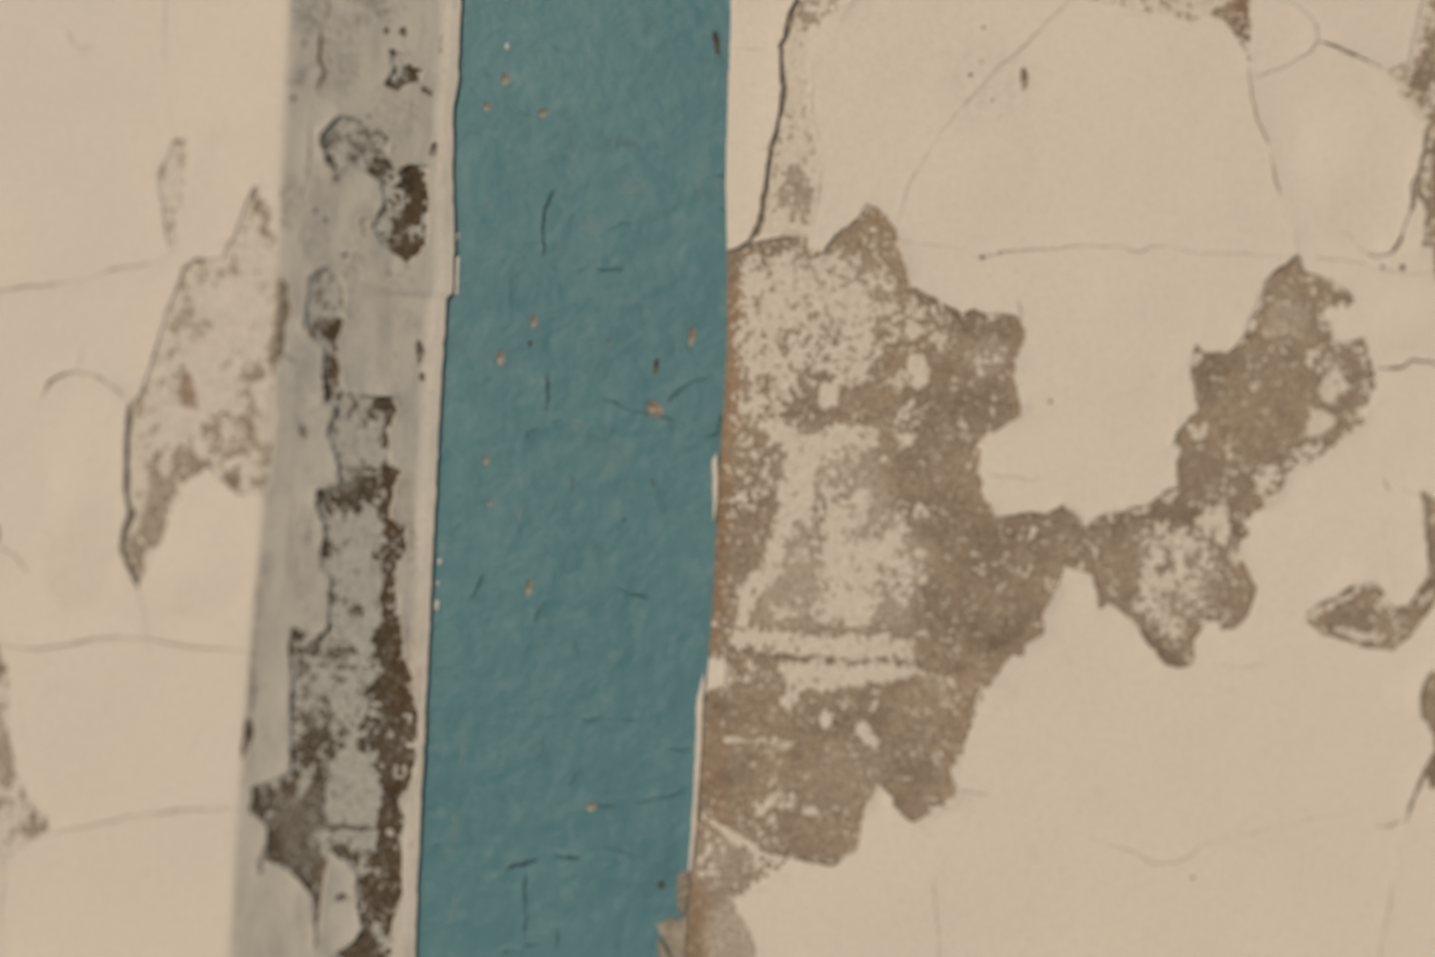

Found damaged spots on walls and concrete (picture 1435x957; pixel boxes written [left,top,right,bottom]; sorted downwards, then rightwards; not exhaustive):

crack [291,0,330,194]
peeling [319,115,437,263]
crack [717,0,799,255]
crack [897,0,1390,258]
crack [1369,133,1431,257]
peeling [1388,0,1435,280]
crack [47,349,140,587]
peeling [126,186,418,957]
peeling [656,0,1376,957]
peeling [1306,491,1435,651]
peeling [0,652,50,860]
crack [1374,753,1435,828]